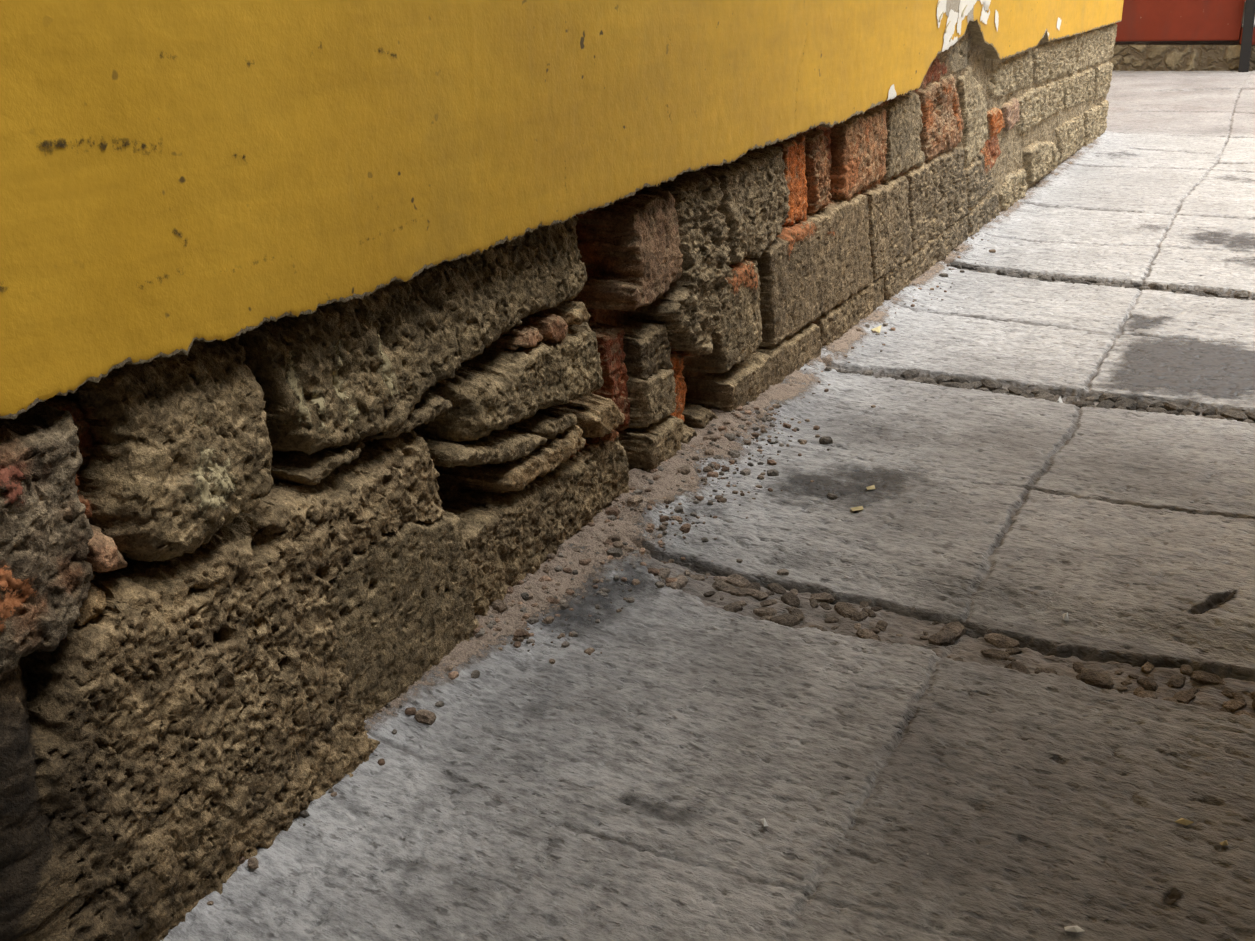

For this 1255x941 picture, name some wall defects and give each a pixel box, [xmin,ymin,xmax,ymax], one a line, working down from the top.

flaking render [0,0,1122,419]
damp [1099,315,1255,399]